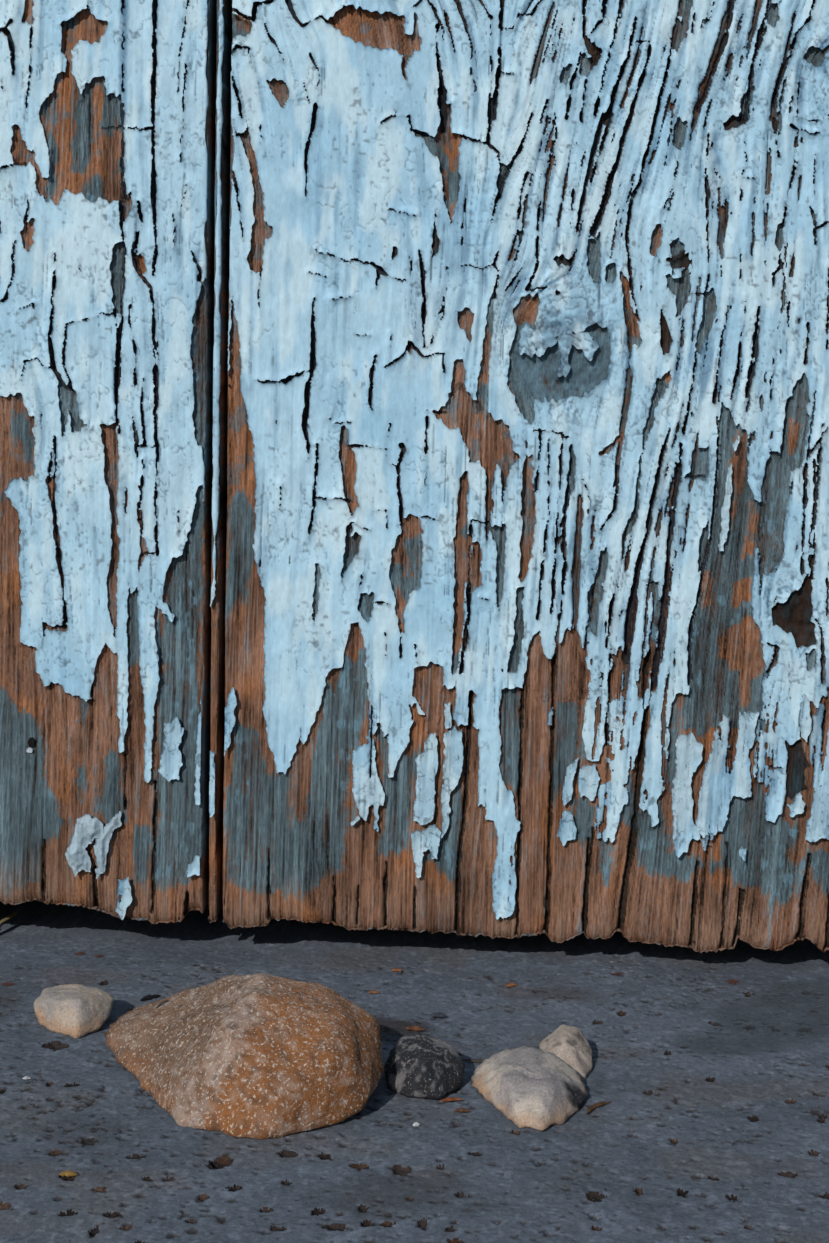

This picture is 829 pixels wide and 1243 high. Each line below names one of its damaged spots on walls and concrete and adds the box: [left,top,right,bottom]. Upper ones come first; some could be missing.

peeling [11,5,132,219]
crack [0,0,189,557]
peeling [110,239,146,314]
peeling [190,251,207,448]
crack [232,170,243,237]
crack [232,0,330,196]
peeling [327,5,421,80]
peeling [586,232,642,348]
peeling [650,224,717,355]
crack [47,436,68,628]
peeling [0,289,829,952]
crack [258,0,829,949]